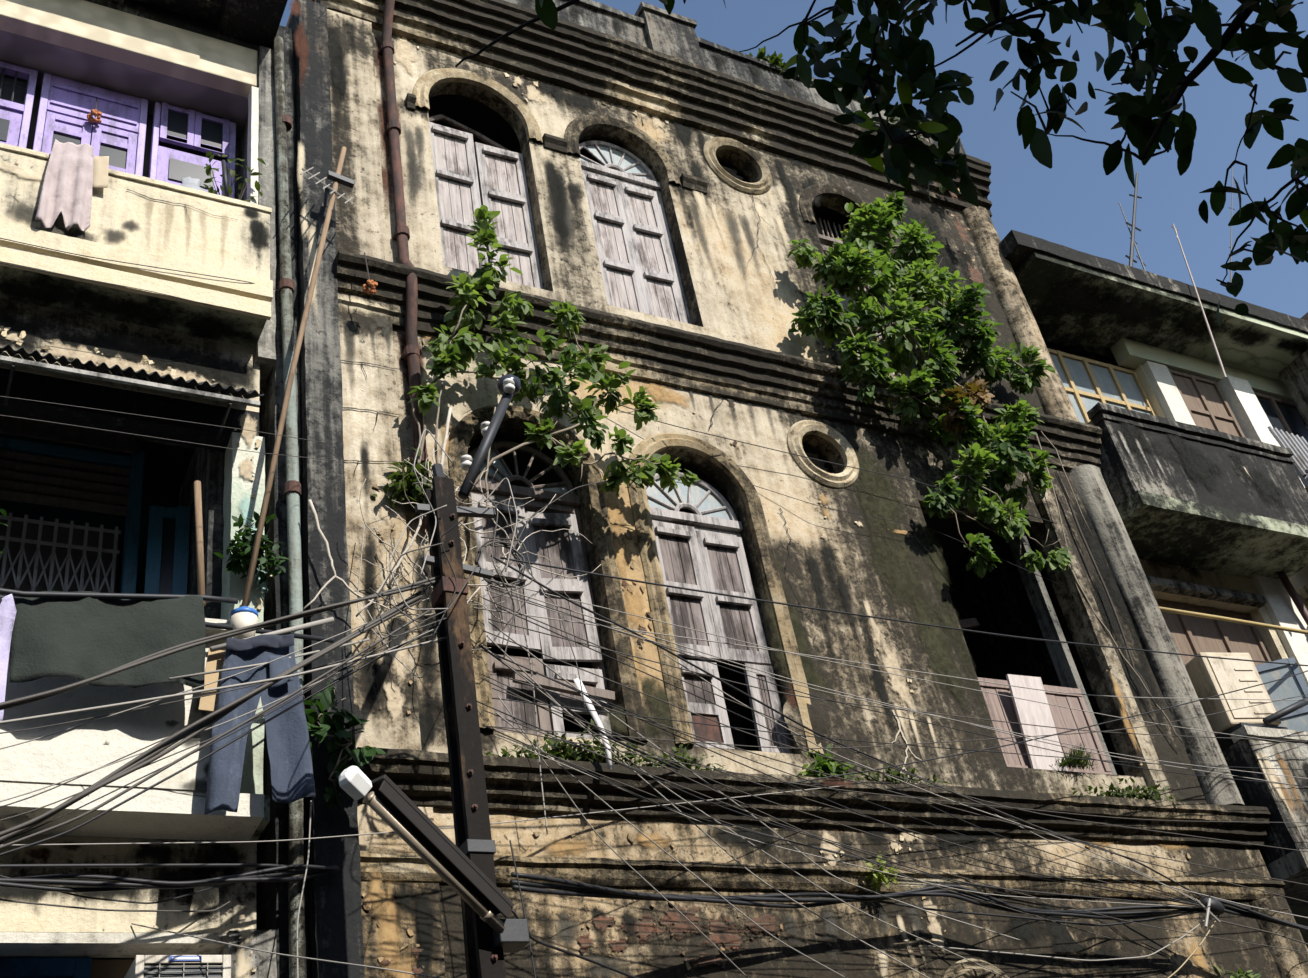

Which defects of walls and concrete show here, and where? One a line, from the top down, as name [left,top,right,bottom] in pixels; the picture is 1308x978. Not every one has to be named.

damp [328,20,355,111]
rust [377,41,400,201]
damp [545,160,582,248]
damp [302,208,316,302]
peeling [0,326,26,346]
damp [0,278,257,386]
peeling [41,340,220,393]
rust [400,333,424,398]
damp [762,556,830,696]
damp [806,541,936,746]
damp [65,843,245,905]
spalling [577,901,783,970]